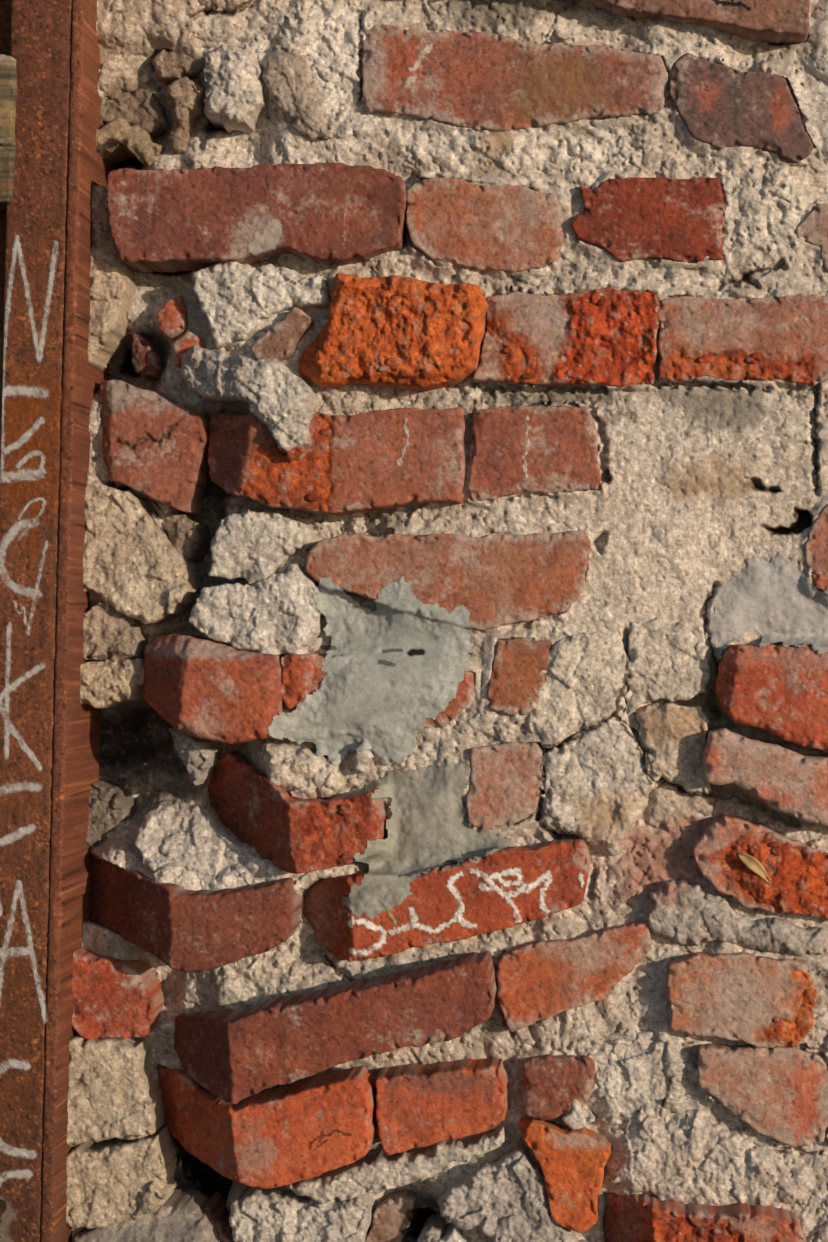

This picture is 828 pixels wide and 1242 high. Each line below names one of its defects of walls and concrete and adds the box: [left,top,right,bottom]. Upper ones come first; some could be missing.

spalling [240,414,335,511]
crack [535,632,712,848]